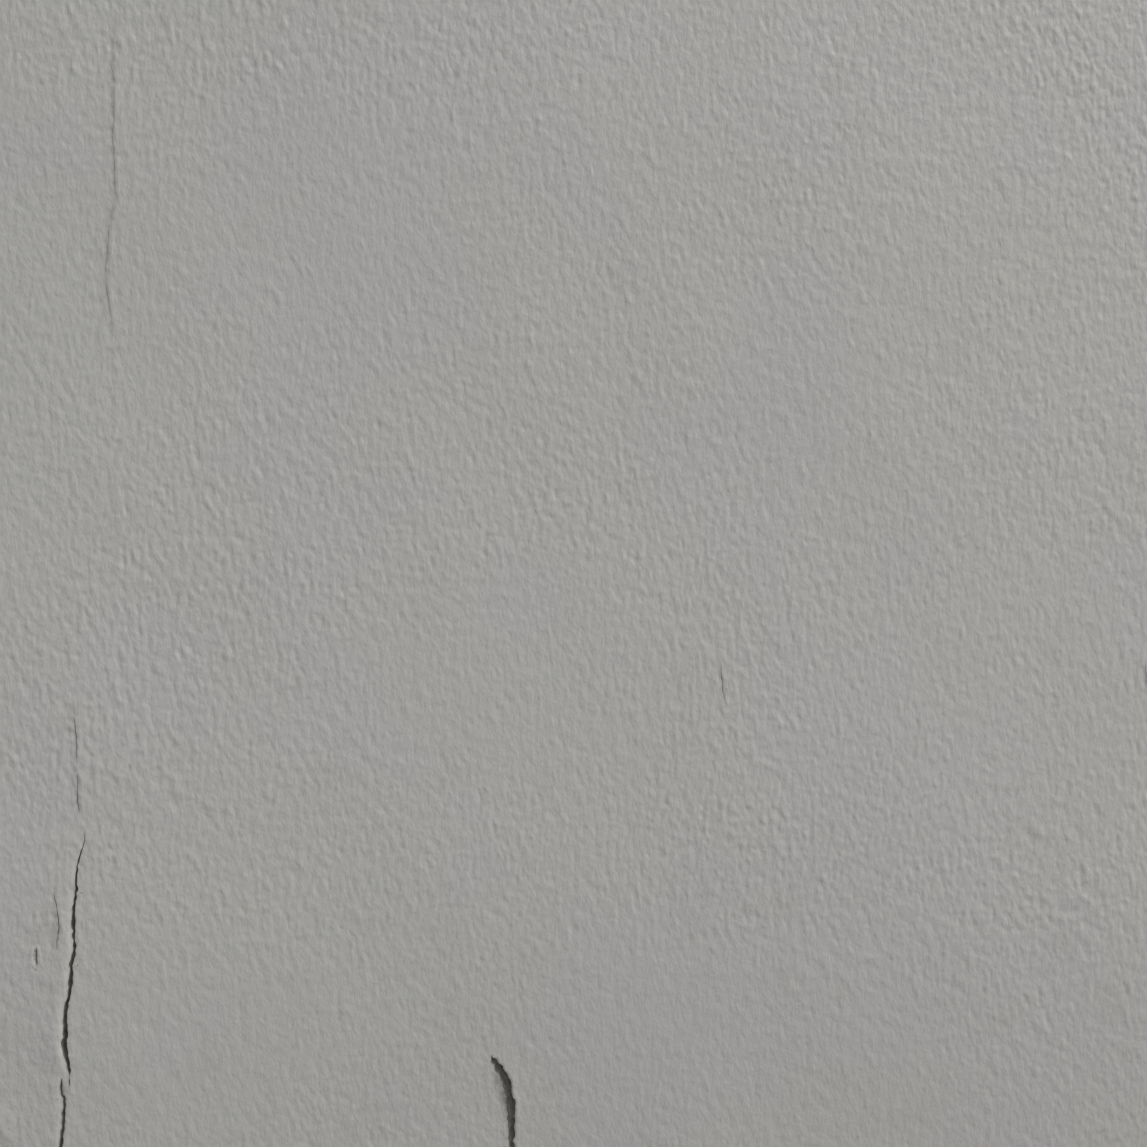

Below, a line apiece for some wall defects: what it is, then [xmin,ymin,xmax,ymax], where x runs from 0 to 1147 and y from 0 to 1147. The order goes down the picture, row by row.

crack [48,697,92,1147]